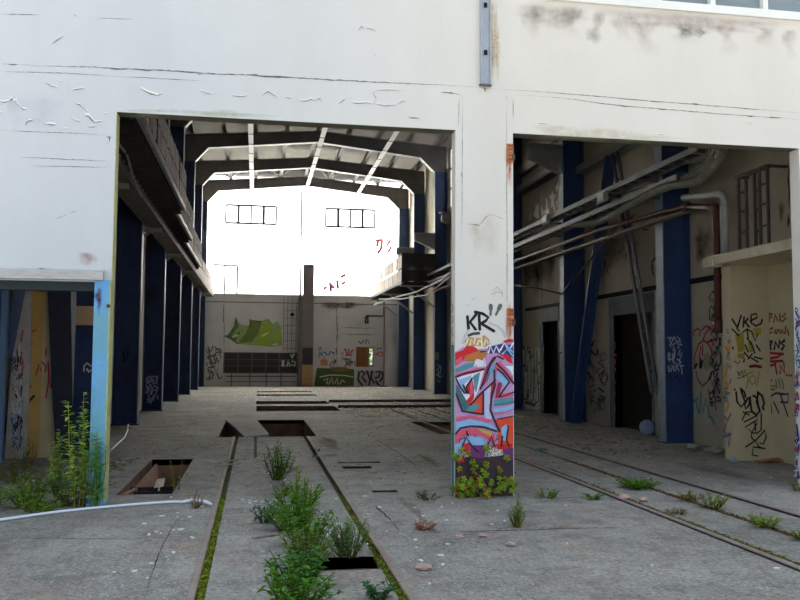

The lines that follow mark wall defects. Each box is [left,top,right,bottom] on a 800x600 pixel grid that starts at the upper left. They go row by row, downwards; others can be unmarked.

crack [0,64,486,95]
crack [506,90,794,119]
crack [144,516,180,598]